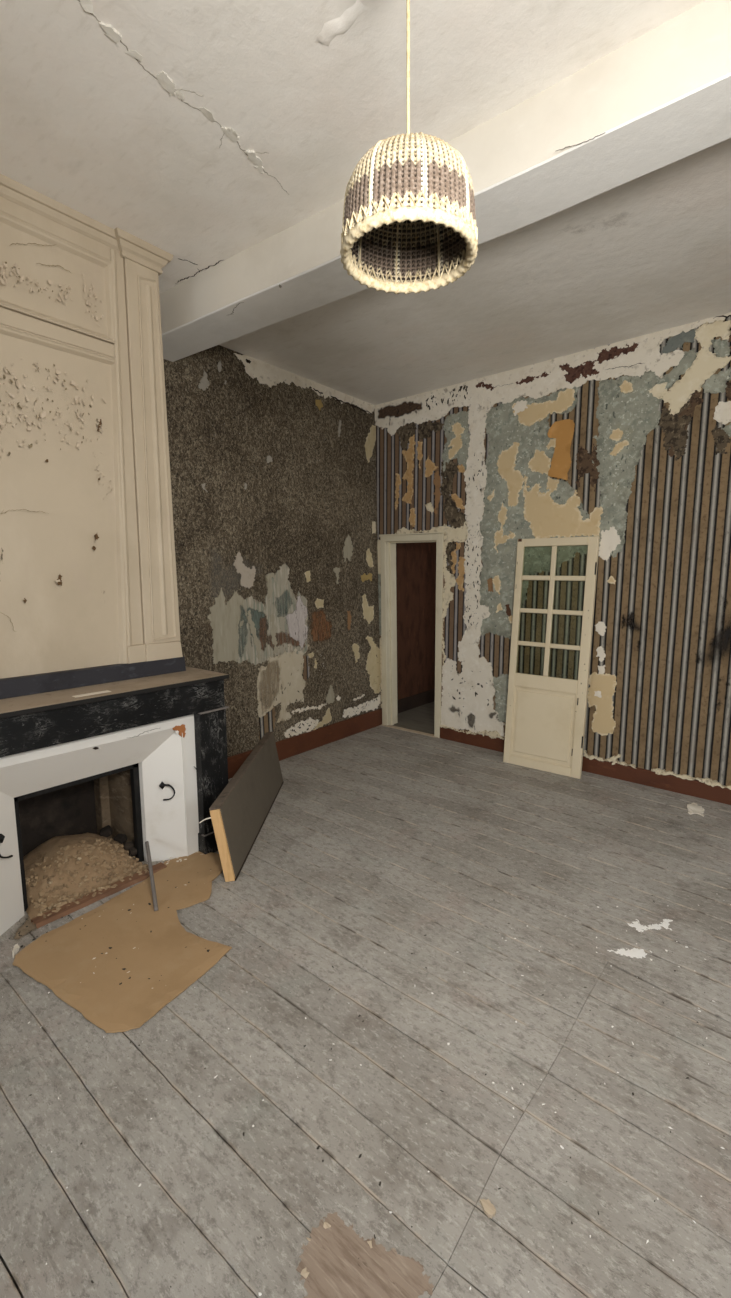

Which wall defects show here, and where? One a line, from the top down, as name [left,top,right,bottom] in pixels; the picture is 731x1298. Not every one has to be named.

crack [78,0,287,192]
flaking render [207,313,731,740]
spalling [172,724,187,738]